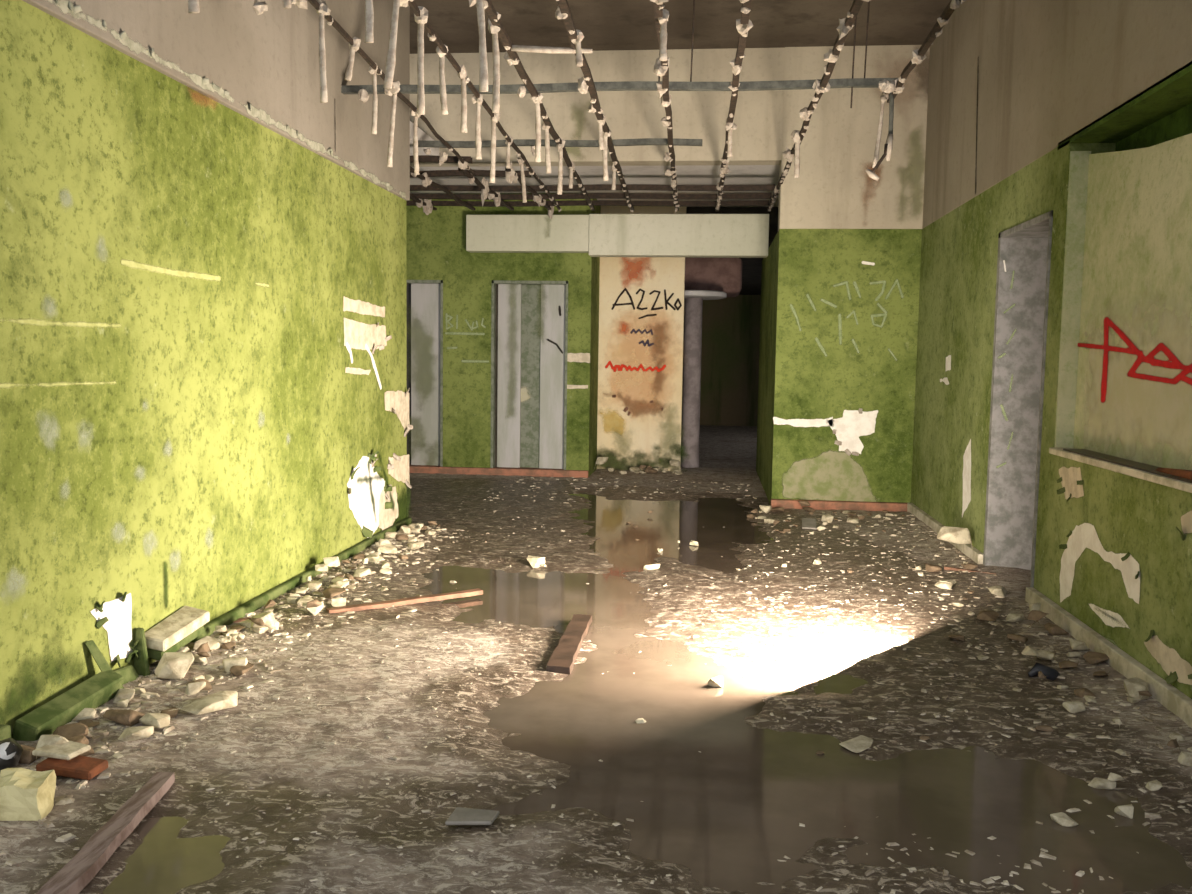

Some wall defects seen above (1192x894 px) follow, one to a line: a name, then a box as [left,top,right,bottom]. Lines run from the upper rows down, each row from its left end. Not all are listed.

corrosion [623,258,646,284]
peeling [343,296,413,438]
peeling [773,408,878,456]
peeling [347,450,412,538]
peeling [1059,523,1140,604]
peeling [91,592,140,668]
peeling [1089,604,1130,629]
peeling [1144,630,1192,685]